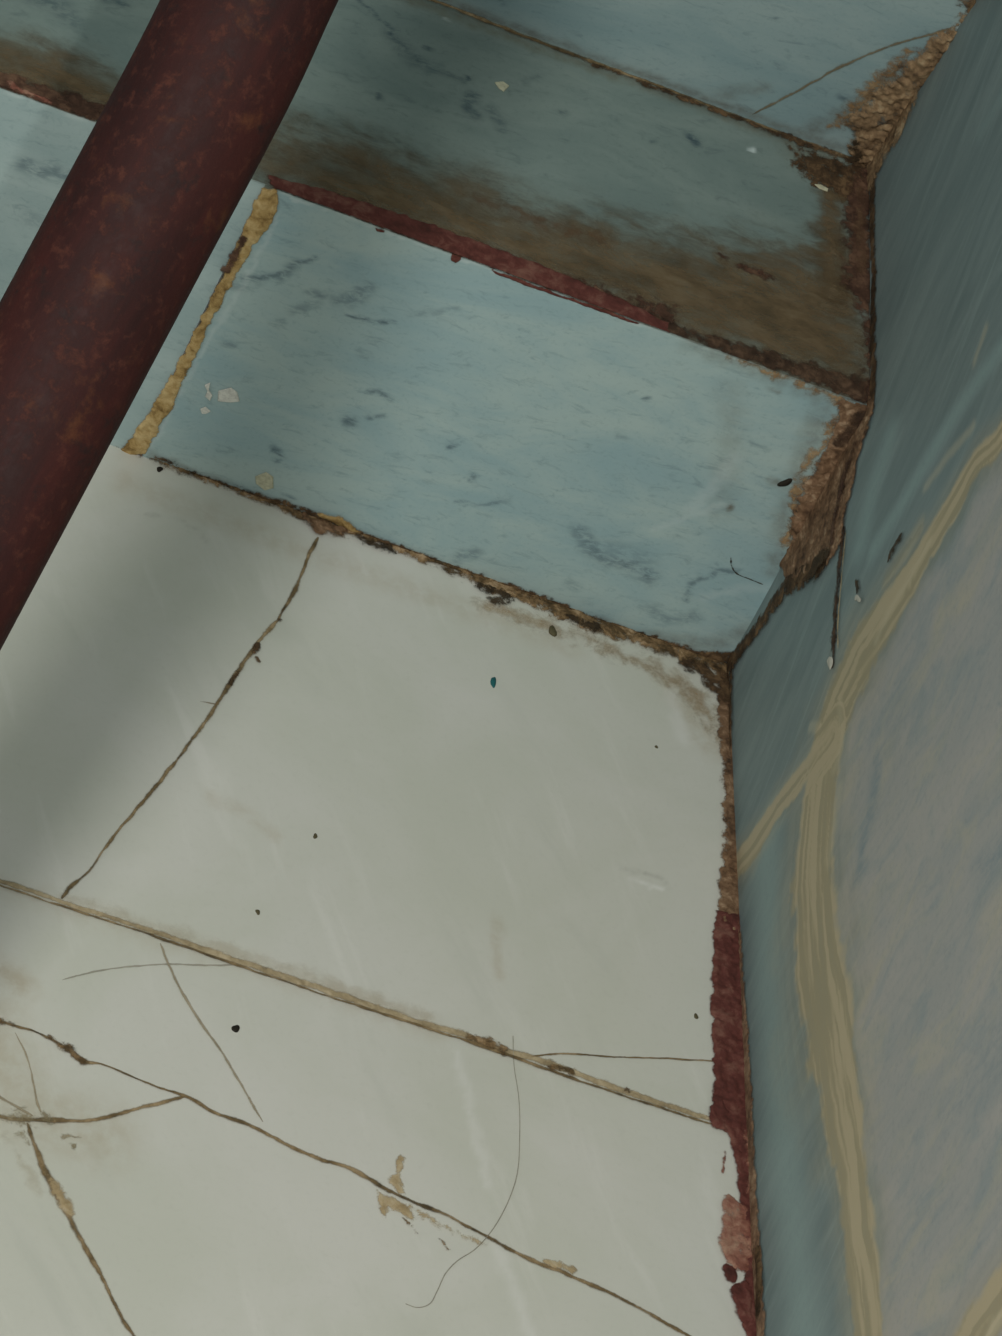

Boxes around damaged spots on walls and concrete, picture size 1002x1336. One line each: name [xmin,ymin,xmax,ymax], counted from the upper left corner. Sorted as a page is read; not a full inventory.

spalling [946,0,976,37]
leakage [260,140,870,396]
crack [0,537,713,1336]
peeling [709,866,765,1336]